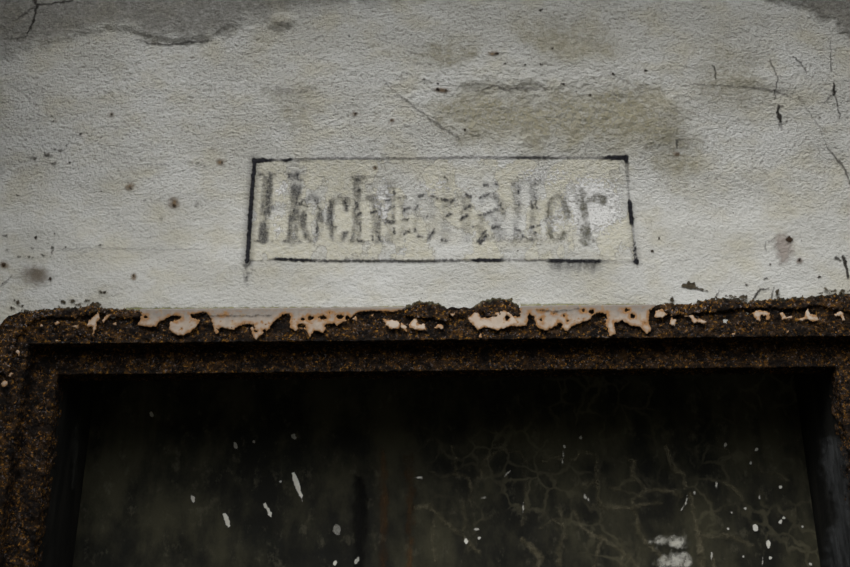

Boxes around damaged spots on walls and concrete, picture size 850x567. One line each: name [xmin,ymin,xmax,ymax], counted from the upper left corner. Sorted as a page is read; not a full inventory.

crack [18,0,73,34]
crack [772,66,783,122]
rust [0,302,142,377]
peeling [58,290,116,335]
peeling [138,307,443,340]
rust [404,297,521,322]
peeling [468,304,706,338]
rust [649,292,850,317]
peeling [752,310,770,321]
peeling [780,309,819,322]